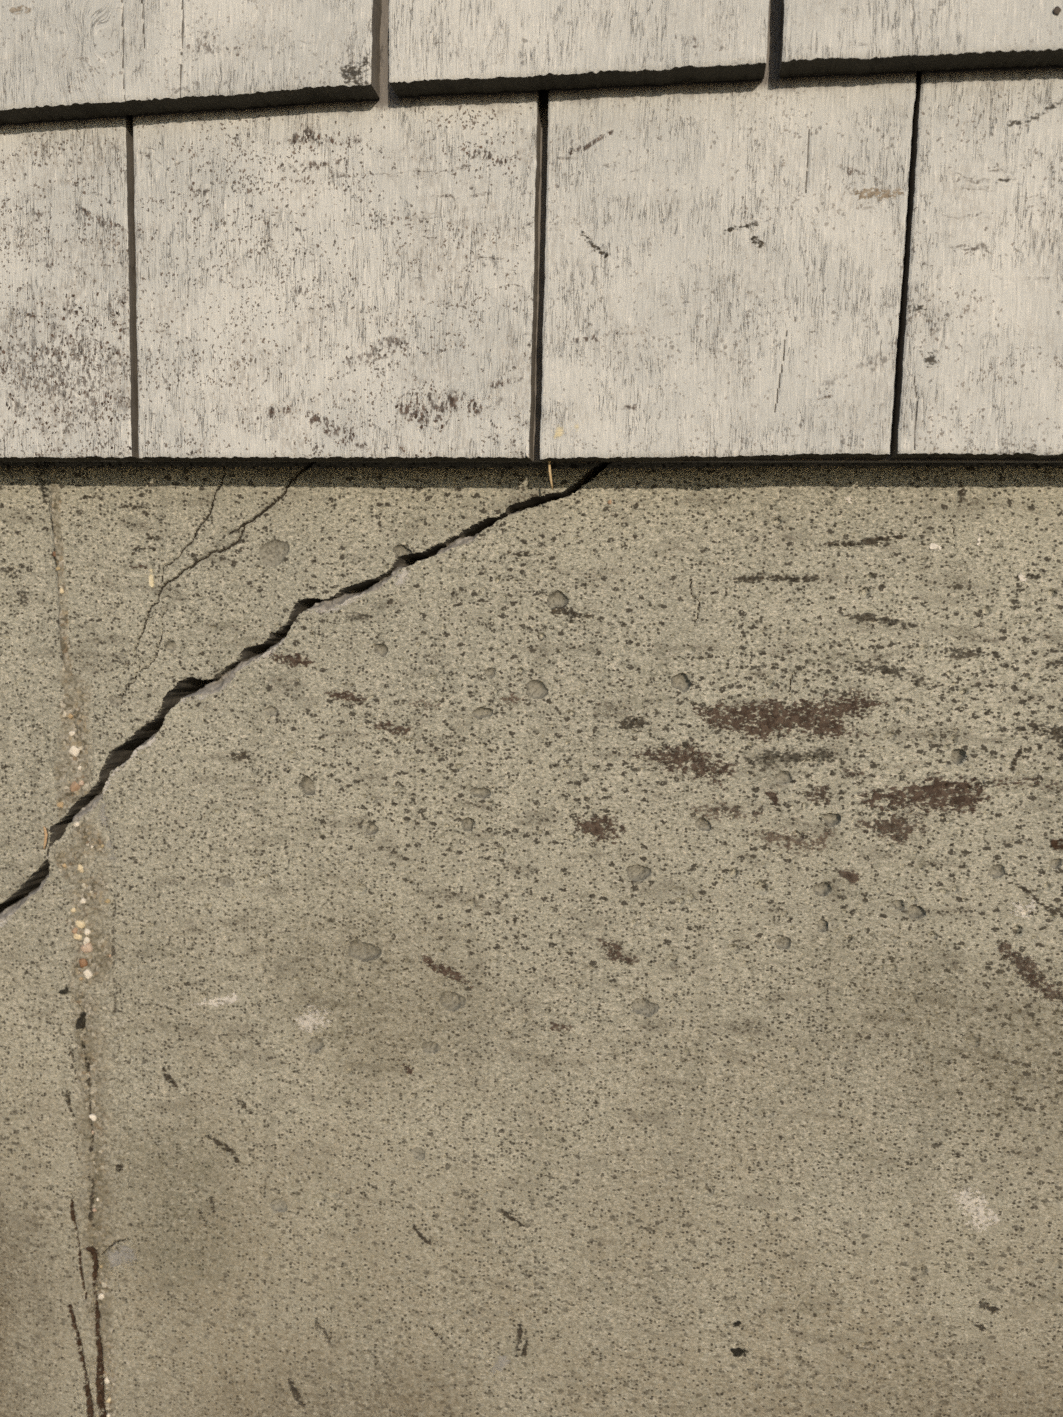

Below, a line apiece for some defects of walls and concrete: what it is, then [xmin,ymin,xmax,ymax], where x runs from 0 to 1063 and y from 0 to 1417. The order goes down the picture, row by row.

crack [0,462,612,922]